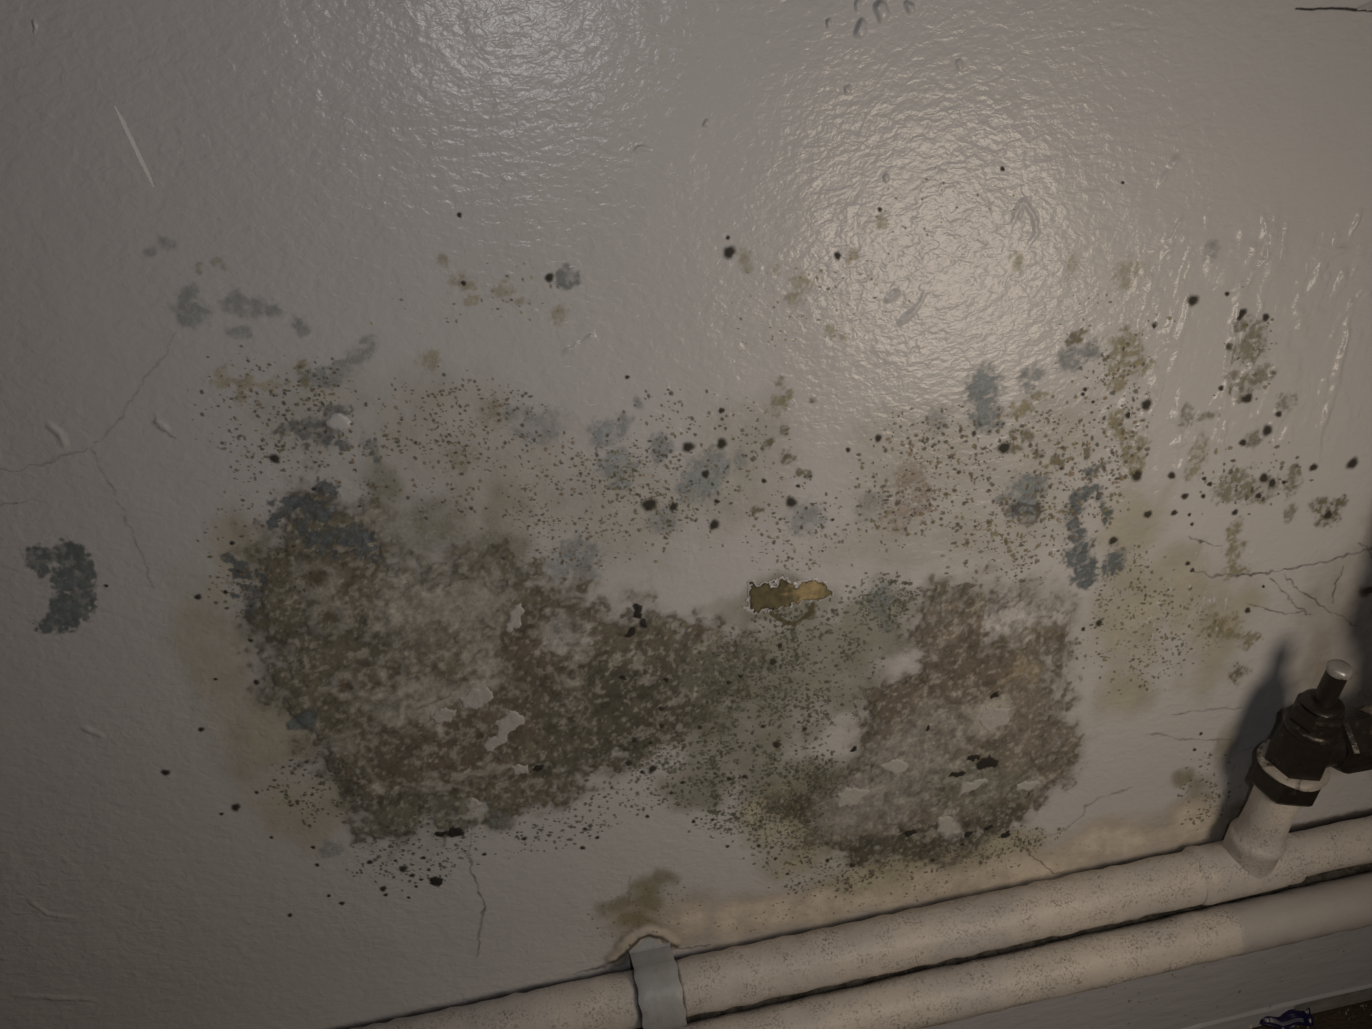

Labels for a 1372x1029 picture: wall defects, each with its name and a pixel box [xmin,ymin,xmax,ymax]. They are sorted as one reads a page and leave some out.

leakage [430,263,580,323]
leakage [725,236,749,273]
leakage [770,246,878,346]
mould [1214,309,1277,402]
mould [1169,400,1317,577]
mould [1313,494,1346,526]
leakage [188,294,1265,948]
peeling [743,577,834,626]